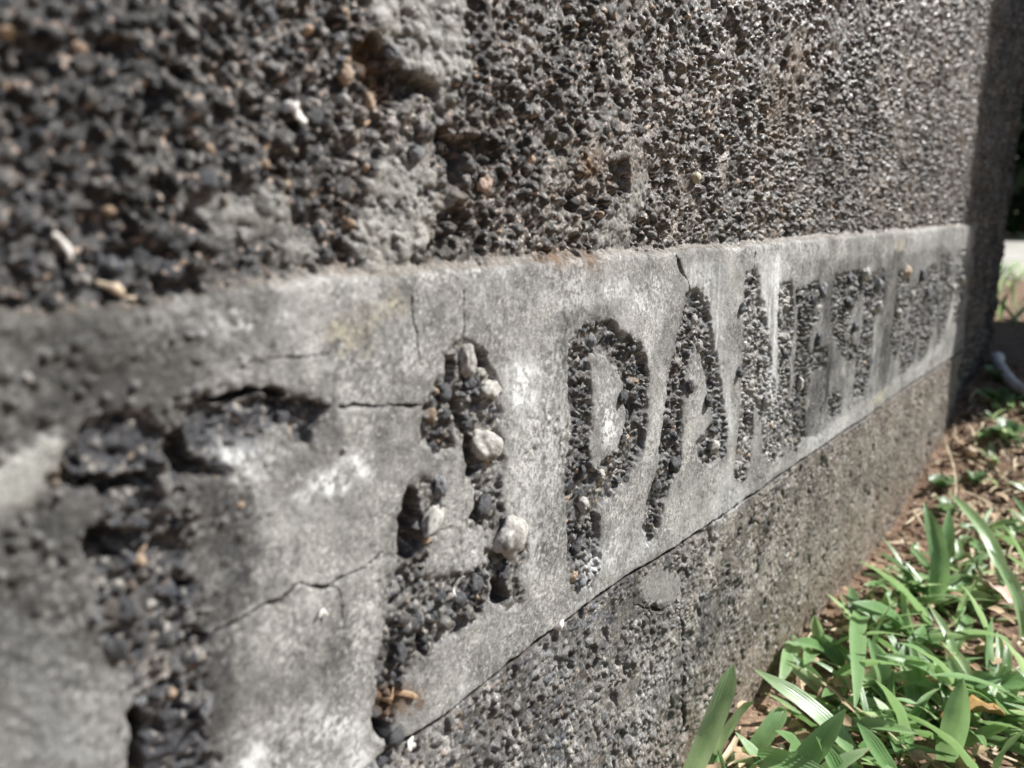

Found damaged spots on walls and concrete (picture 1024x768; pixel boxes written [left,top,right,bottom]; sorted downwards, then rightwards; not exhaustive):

crack [338,400,422,408]
crack [243,551,383,629]